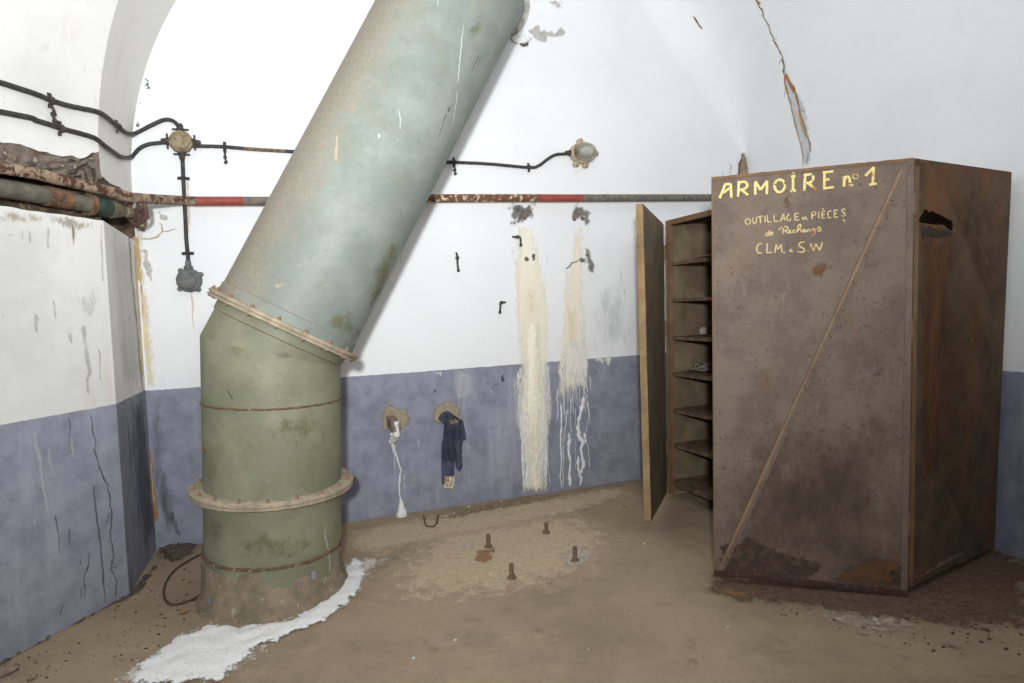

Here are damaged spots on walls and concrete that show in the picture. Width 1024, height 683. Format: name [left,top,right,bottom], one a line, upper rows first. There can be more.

peeling [510,25,565,47]
crack [756,0,811,167]
crack [61,415,117,612]
corrosion [149,450,158,521]
corrosion [474,552,492,562]
damp [351,205,632,604]